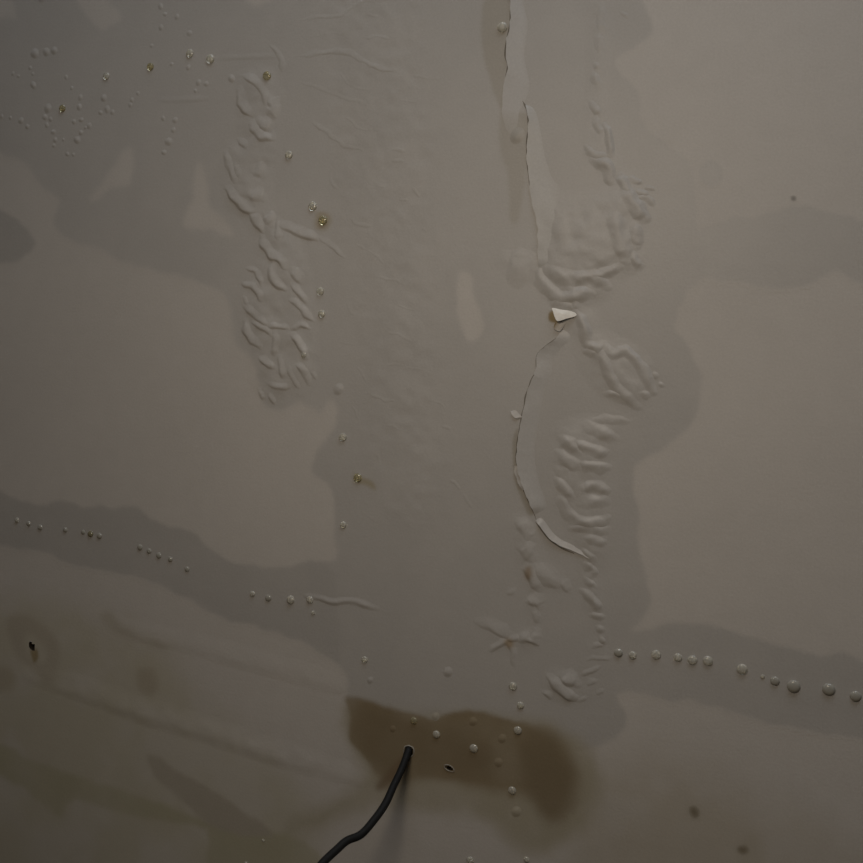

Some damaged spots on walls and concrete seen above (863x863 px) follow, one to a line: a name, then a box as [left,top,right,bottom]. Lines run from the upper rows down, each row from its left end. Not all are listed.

damp [0,0,629,863]
peeling [510,308,588,558]
damp [535,0,863,743]
damp [559,719,863,863]